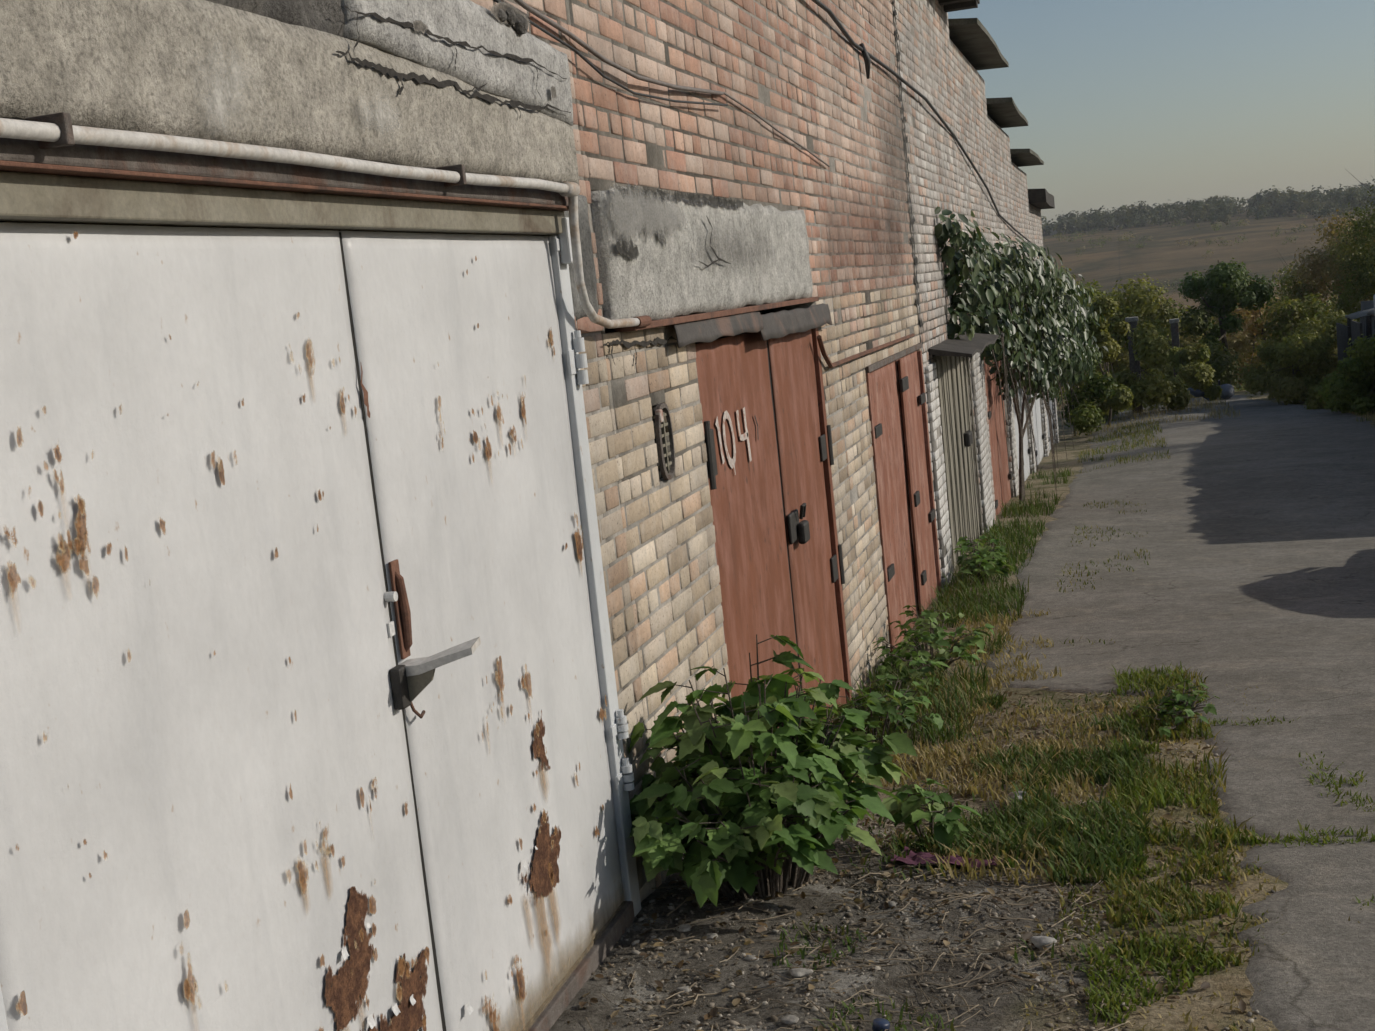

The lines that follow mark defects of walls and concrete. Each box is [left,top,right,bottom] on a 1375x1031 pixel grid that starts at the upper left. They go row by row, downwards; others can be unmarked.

rust [290,340,315,402]
rust [340,365,370,418]
rust [472,378,527,463]
rust [211,451,237,485]
rust [29,445,128,597]
rust [4,527,36,598]
rust [482,656,550,788]
rust [287,822,345,904]
rust [507,803,561,967]
rust [180,946,201,1008]
rust [319,883,430,1031]